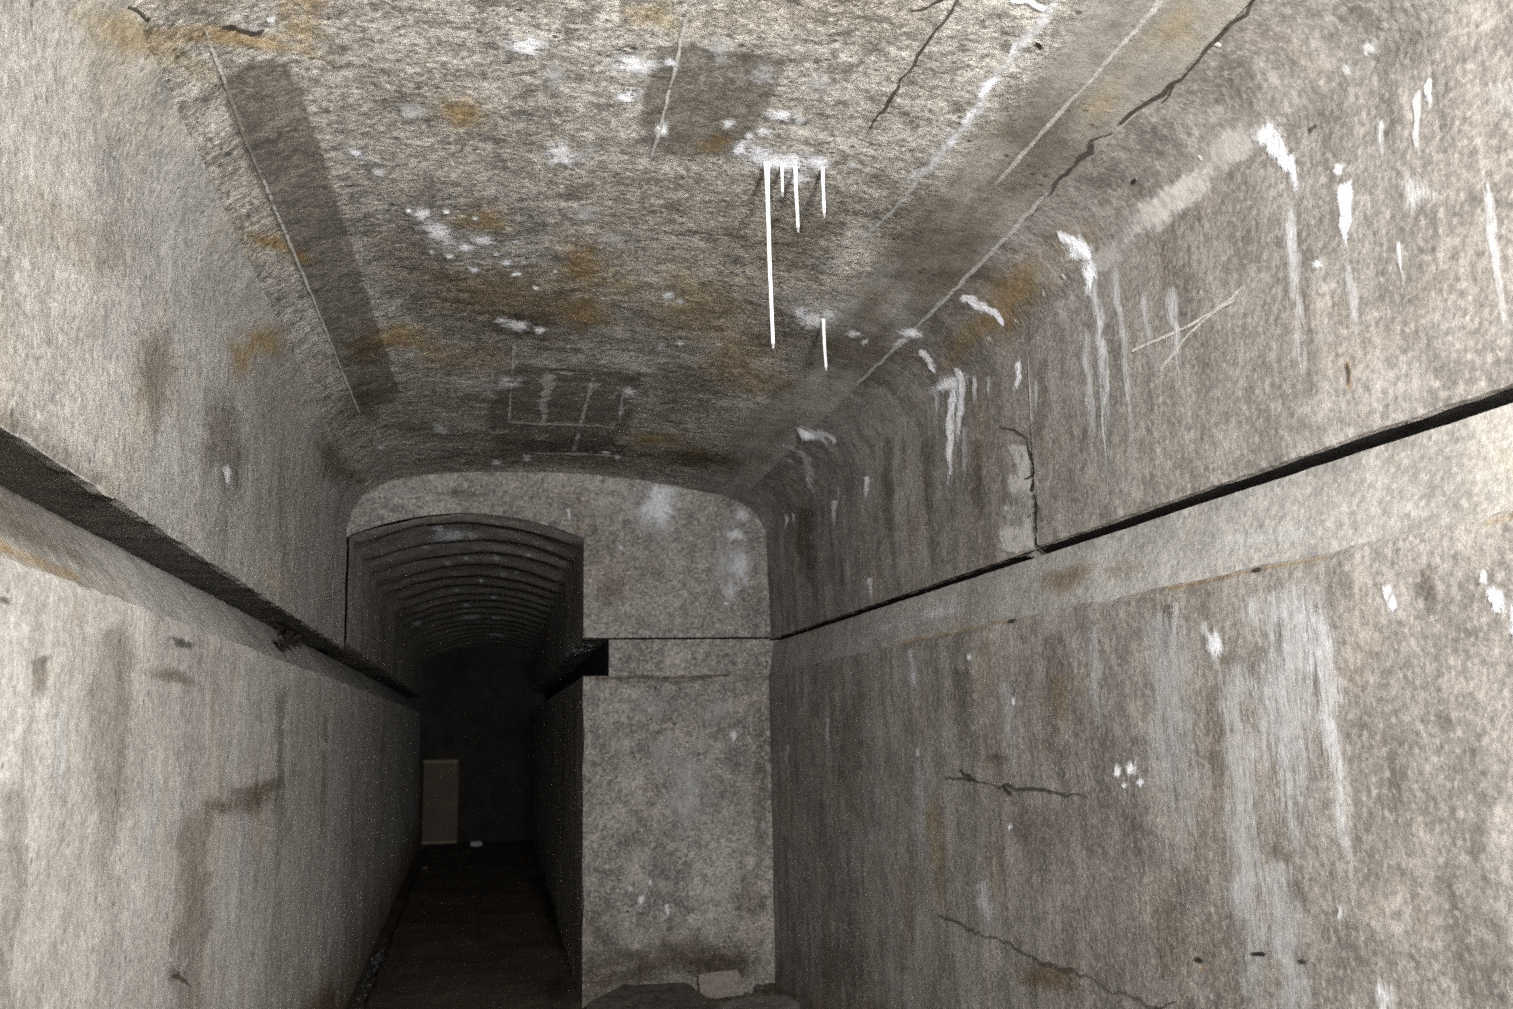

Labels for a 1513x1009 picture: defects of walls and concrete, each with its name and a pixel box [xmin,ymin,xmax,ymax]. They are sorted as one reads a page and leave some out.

crack [870,0,958,129]
crack [907,0,1060,180]
crack [1026,0,1256,219]
water stain [1256,123,1296,181]
water stain [1335,165,1352,243]
water stain [1412,79,1431,147]
water stain [894,328,990,478]
water stain [960,294,1004,326]
water stain [1014,360,1022,388]
water stain [1057,231,1130,454]
crack [1000,426,1046,554]
crack [945,769,1086,797]